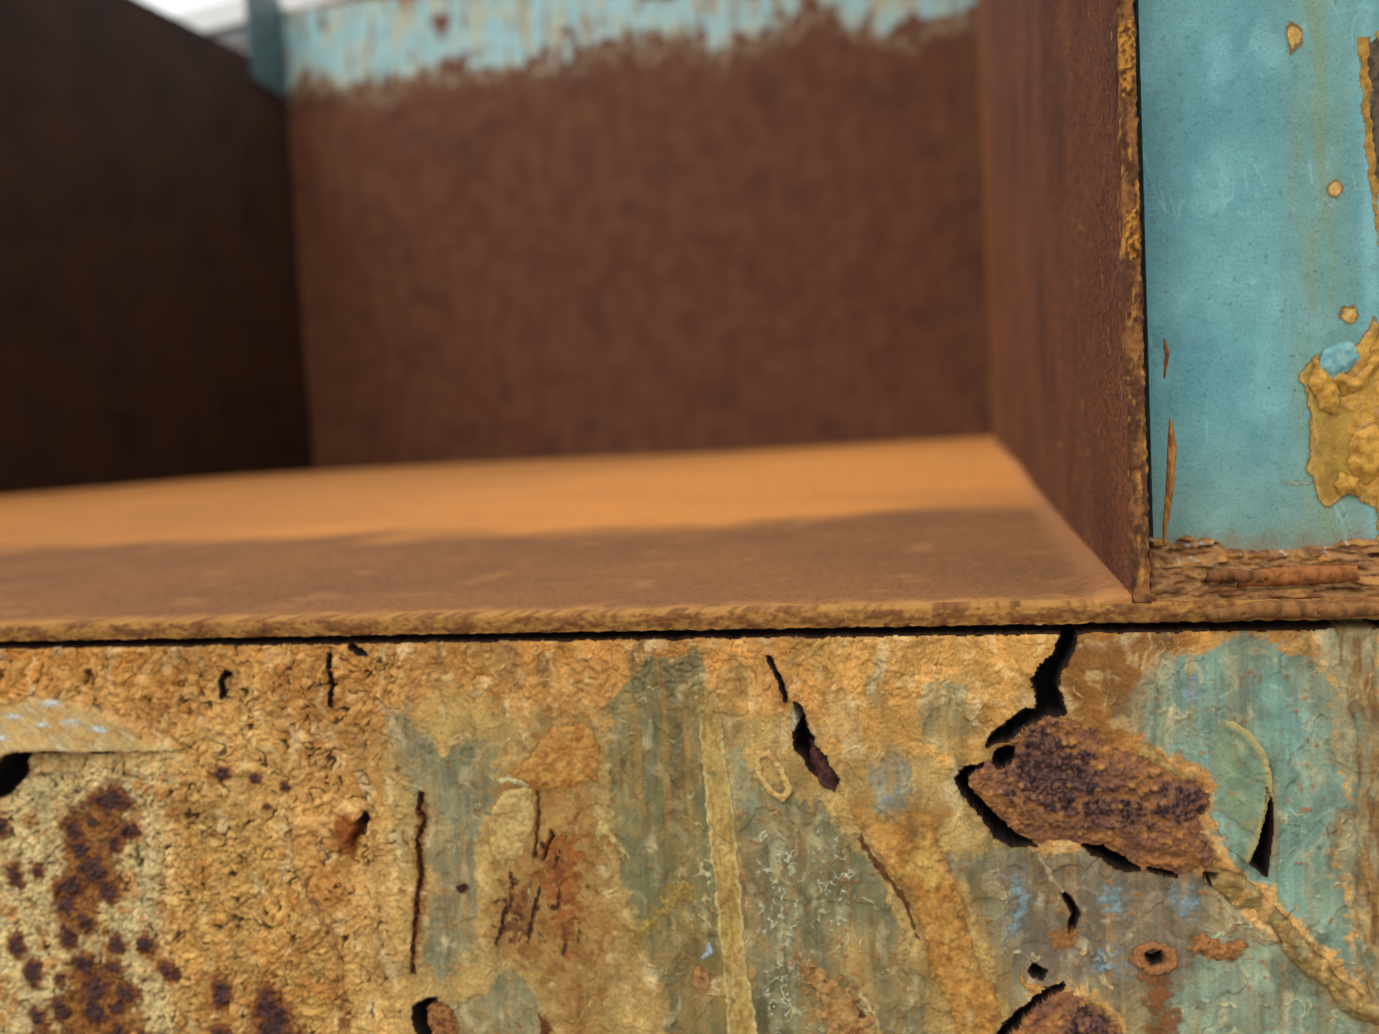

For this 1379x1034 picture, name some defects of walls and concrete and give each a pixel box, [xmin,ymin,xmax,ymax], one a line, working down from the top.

rust [1118,16,1136,98]
rust [1124,208,1141,261]
peeling [1299,305,1379,541]
rust [0,817,10,840]
peeling [0,692,183,799]
rust [212,765,262,784]
crack [0,618,1379,974]
rust [5,783,182,1034]
rust [209,971,303,1034]